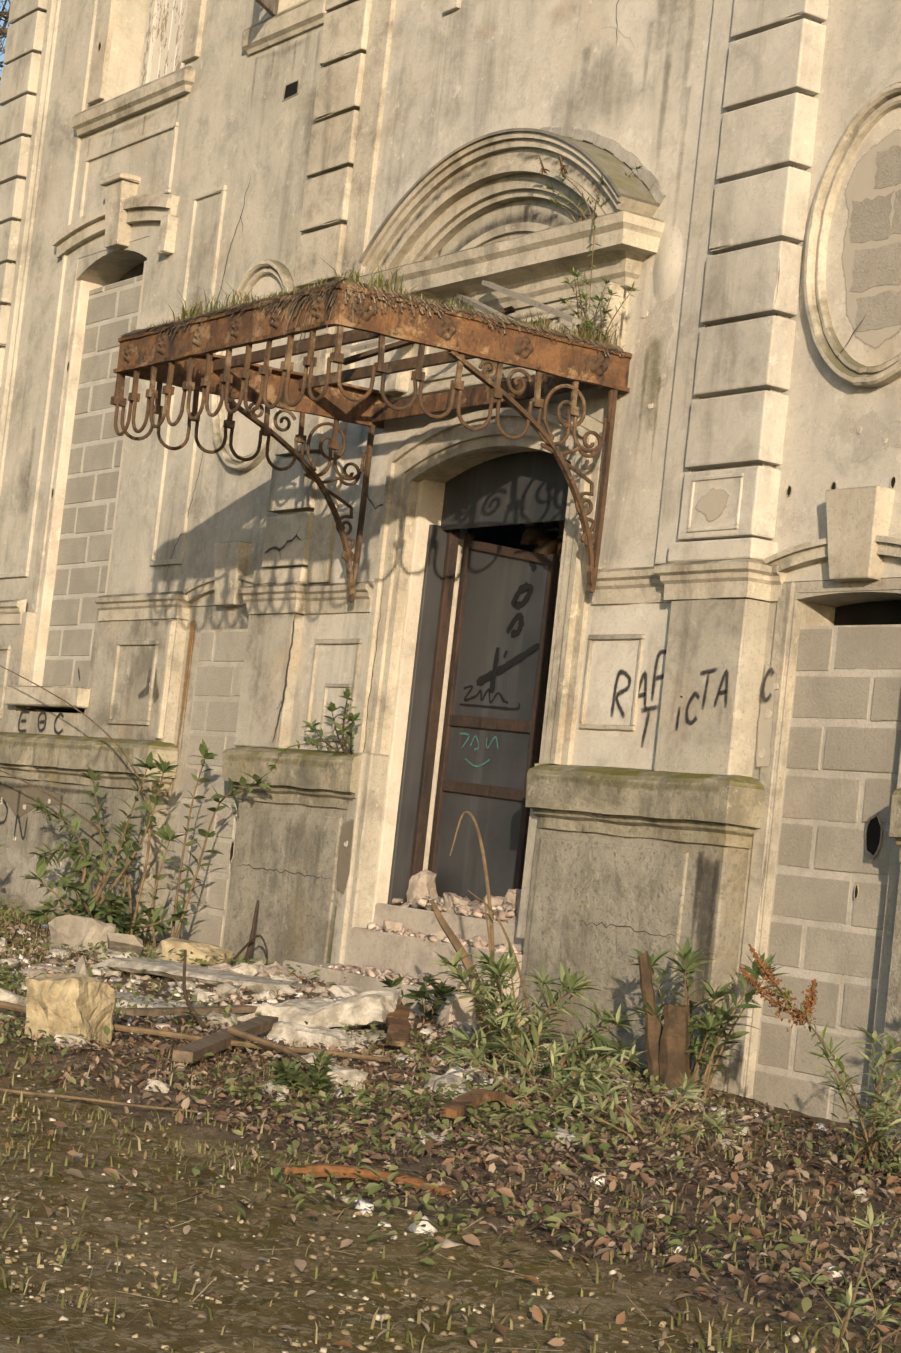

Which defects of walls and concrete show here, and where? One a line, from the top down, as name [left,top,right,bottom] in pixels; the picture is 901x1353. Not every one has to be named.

flaking render [842,130,901,349]
flaking render [696,489,729,522]
corrosion [177,621,196,748]